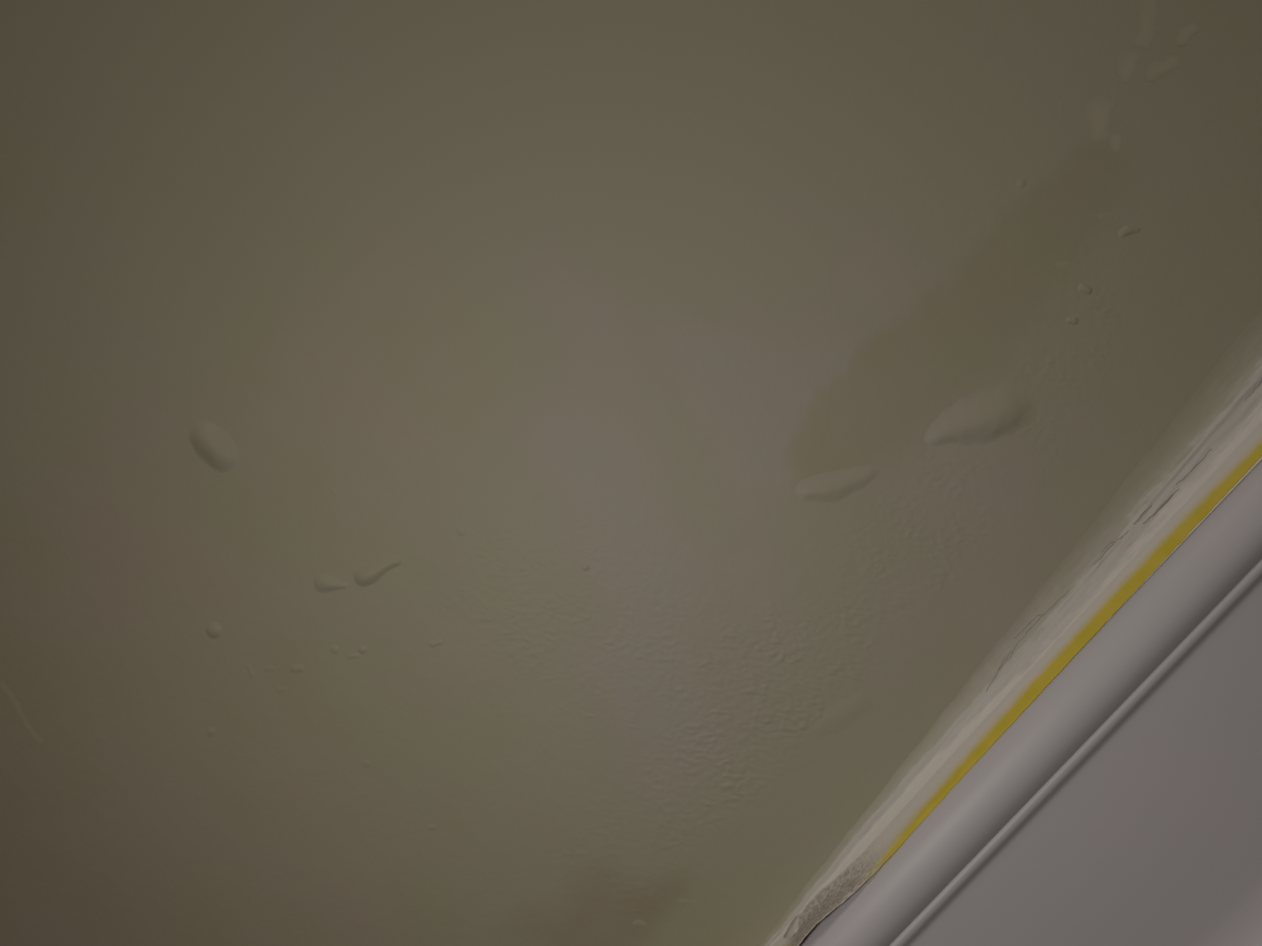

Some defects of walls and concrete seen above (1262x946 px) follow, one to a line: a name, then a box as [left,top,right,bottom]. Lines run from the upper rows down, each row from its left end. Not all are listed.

crack [1095,449,1211,563]